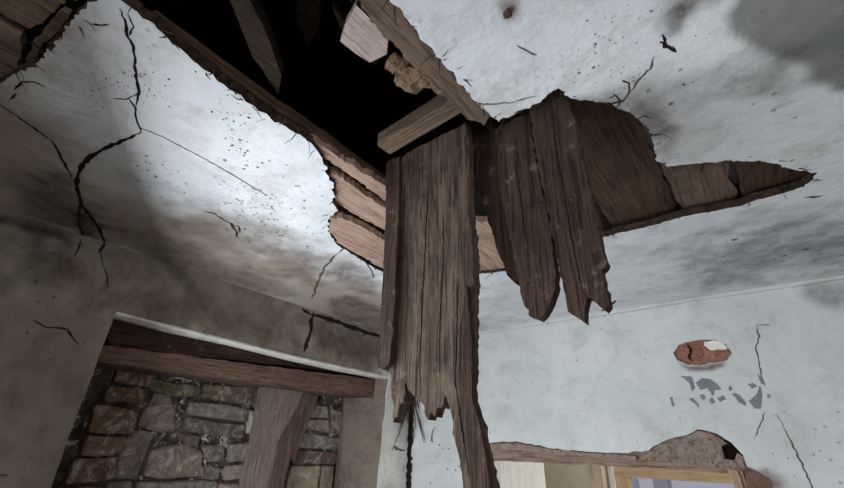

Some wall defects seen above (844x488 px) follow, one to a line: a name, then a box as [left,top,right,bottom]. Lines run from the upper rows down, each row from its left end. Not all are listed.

water stain [733,0,844,89]
crack [0,8,266,289]
crack [34,320,80,345]
crack [302,248,380,352]
flaking render [674,340,771,409]
crack [755,324,770,385]
crack [394,409,434,488]
flaking render [490,431,772,488]
crack [755,412,813,488]